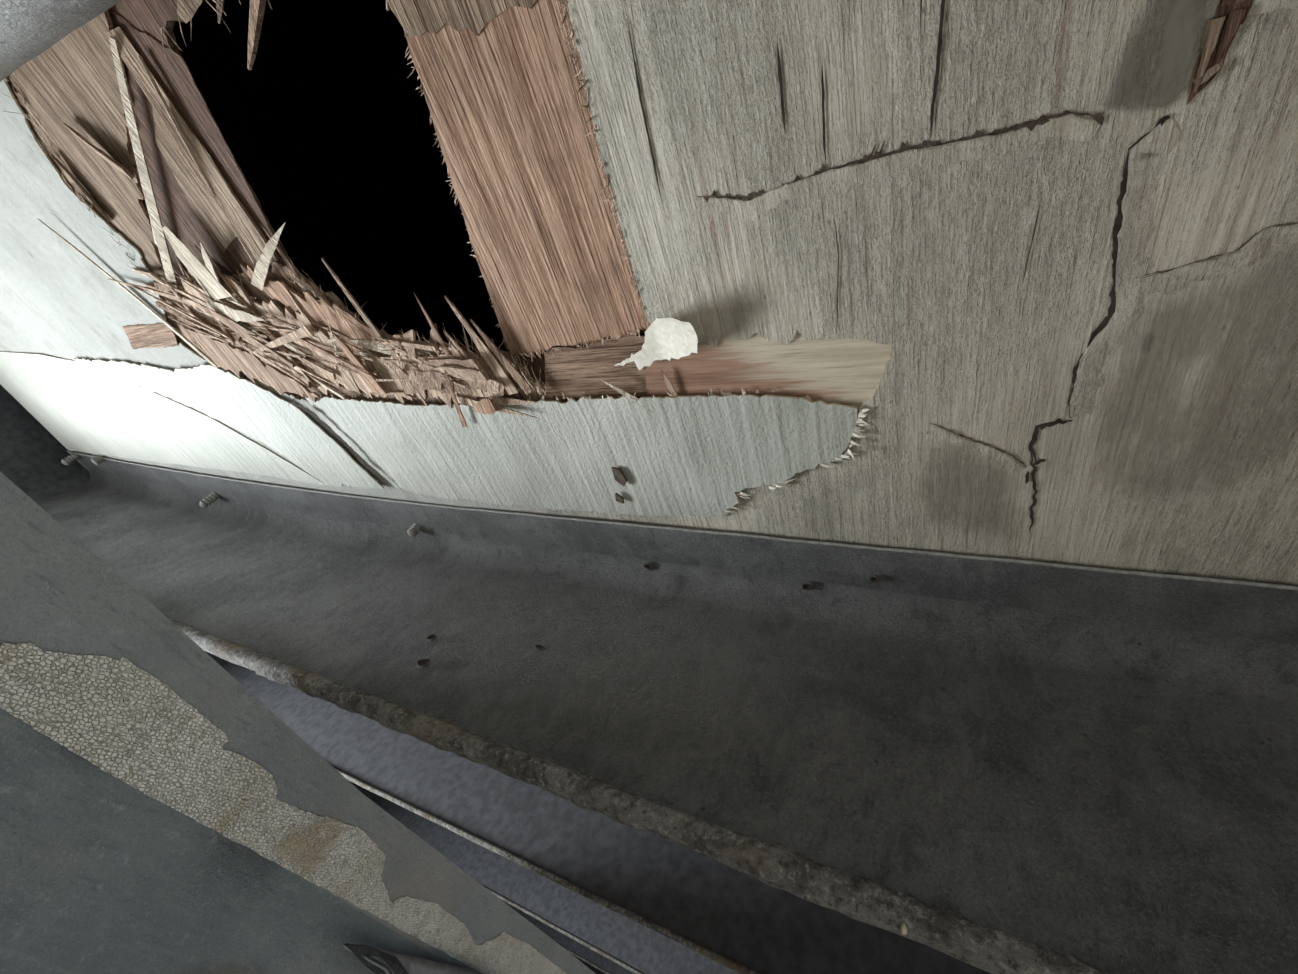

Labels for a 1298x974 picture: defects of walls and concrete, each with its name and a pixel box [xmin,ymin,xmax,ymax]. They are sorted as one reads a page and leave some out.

spalling [0,0,892,427]
crack [697,110,1104,220]
crack [926,115,1298,536]
crack [1247,0,1298,16]